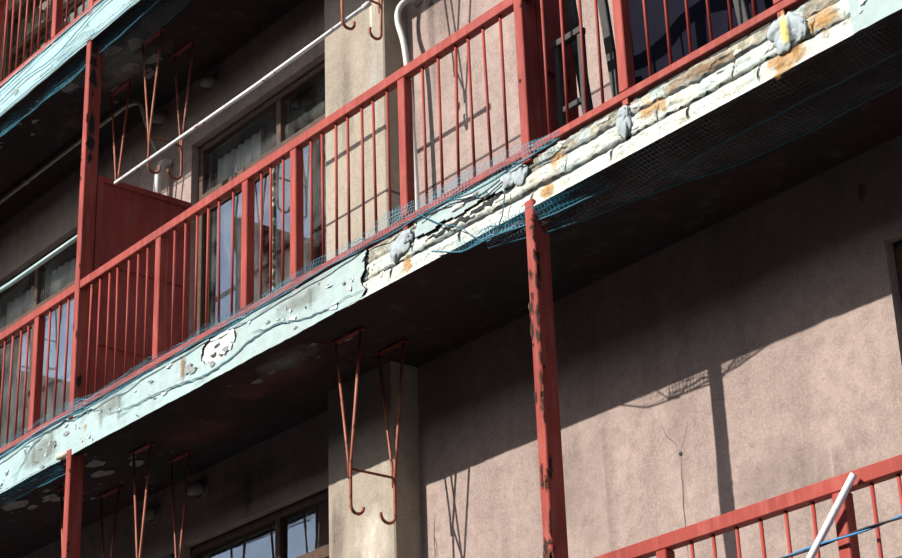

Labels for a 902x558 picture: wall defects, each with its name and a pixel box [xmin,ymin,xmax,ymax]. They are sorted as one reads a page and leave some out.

rust [807,7,835,36]
crack [798,0,847,44]
rust [768,42,803,76]
spalling [318,0,865,421]
crack [12,37,778,484]
spalling [184,328,237,374]